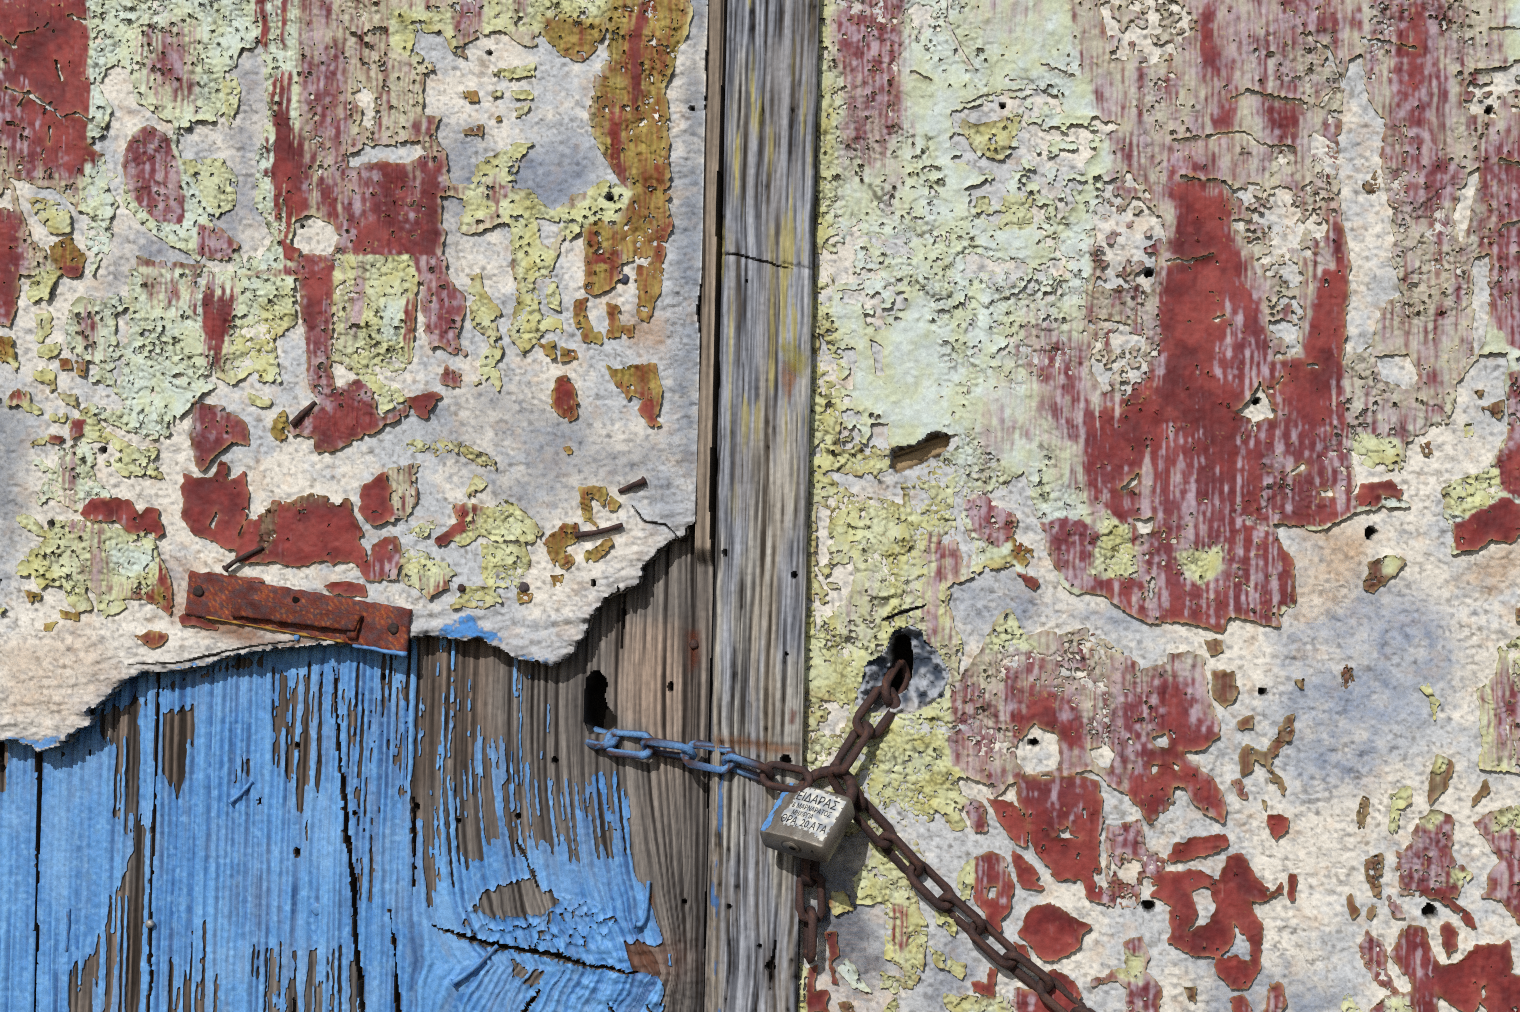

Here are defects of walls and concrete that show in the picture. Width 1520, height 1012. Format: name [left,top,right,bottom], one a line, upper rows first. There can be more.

crack [725,252,793,270]
peeling [163,704,195,799]
peeling [273,662,323,839]
peeling [397,635,594,895]
peeling [69,692,146,1012]
crack [332,666,652,1012]
peeling [473,878,559,924]
peeling [169,920,219,1012]
peeling [252,942,358,1012]
peeling [625,929,704,1012]